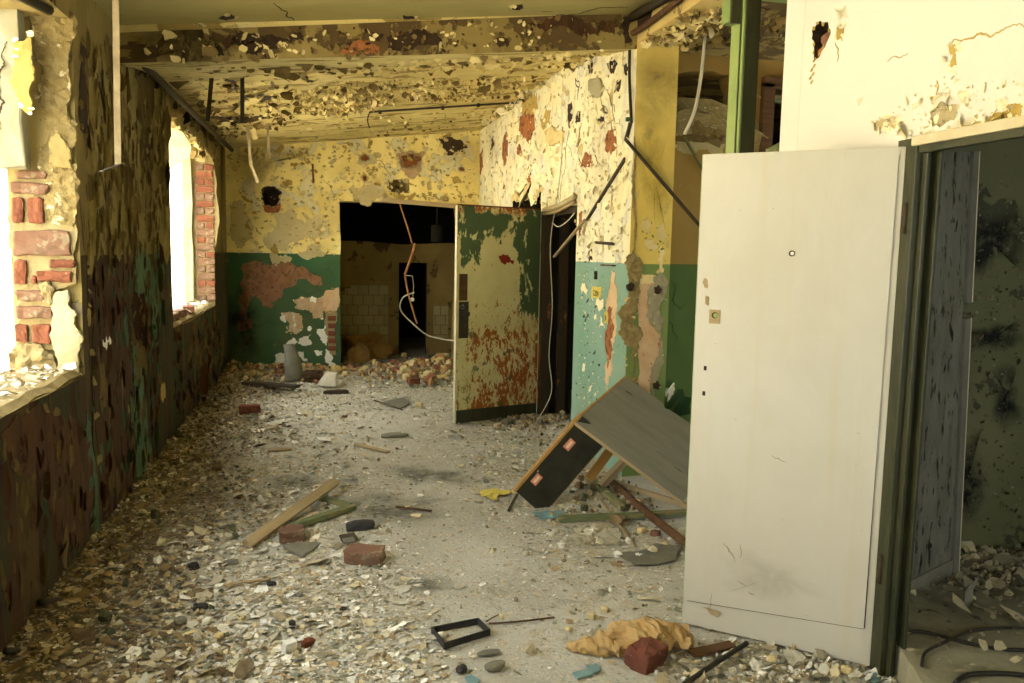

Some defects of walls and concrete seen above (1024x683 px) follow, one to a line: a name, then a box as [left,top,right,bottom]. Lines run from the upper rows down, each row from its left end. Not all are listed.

spalling [809,21,846,84]
crack [948,23,1024,43]
peeling [871,41,1024,140]
spalling [754,120,769,152]
water stain [975,221,1018,269]
flaking render [0,4,731,612]